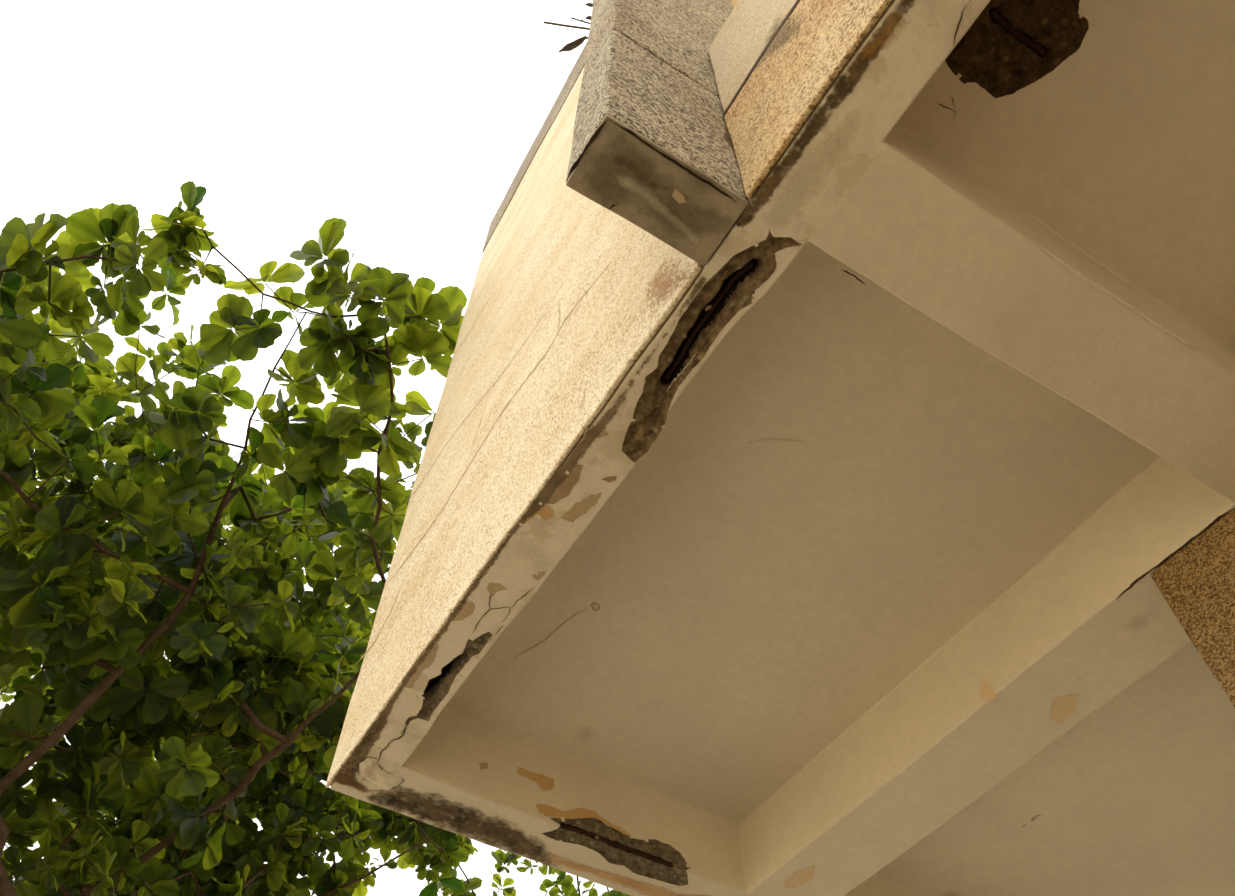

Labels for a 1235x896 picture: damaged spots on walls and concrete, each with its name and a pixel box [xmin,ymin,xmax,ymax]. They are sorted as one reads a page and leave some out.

spalling [945,0,1089,98]
damp [735,0,913,227]
rust [650,262,688,303]
spalling [621,230,802,463]
crack [357,263,610,663]
damp [334,334,667,865]
spalling [400,632,494,726]
crack [357,721,408,791]
spalling [517,767,691,886]